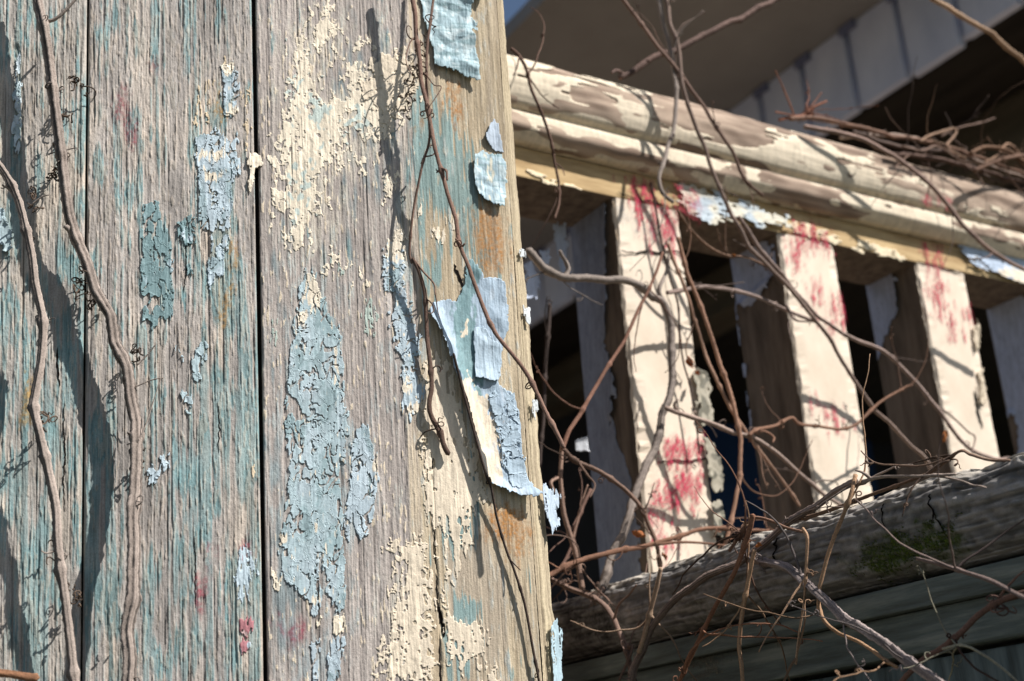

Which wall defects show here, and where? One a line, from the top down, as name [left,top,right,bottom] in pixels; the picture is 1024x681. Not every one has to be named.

peeling [139,0,481,331]
peeling [474,54,1024,453]
peeling [233,228,561,681]
crack [927,494,948,538]